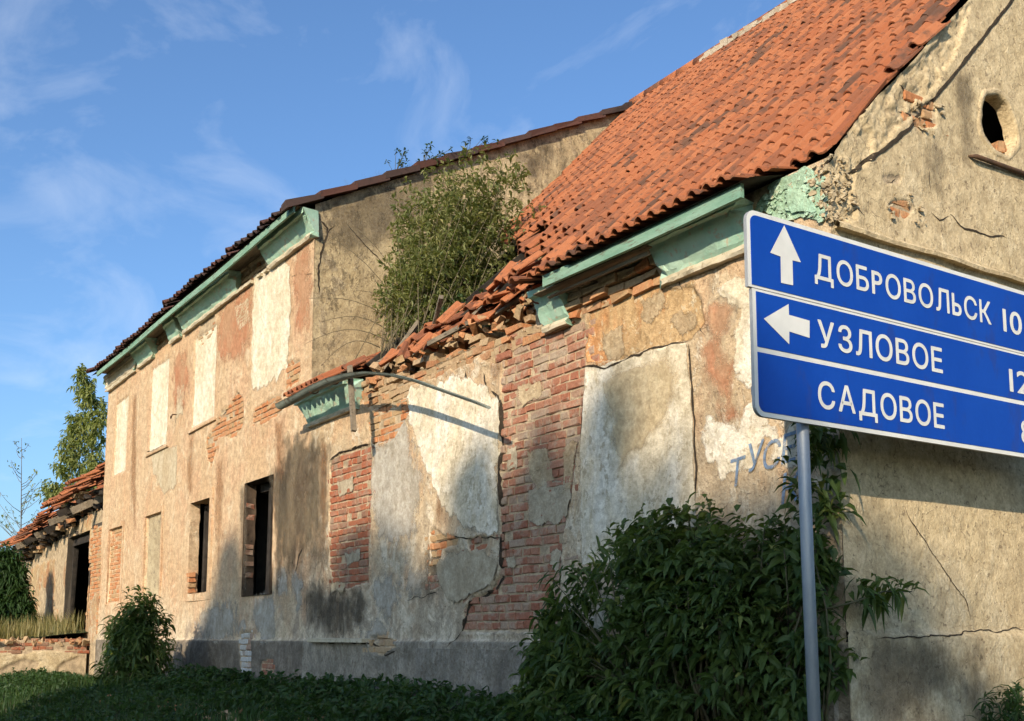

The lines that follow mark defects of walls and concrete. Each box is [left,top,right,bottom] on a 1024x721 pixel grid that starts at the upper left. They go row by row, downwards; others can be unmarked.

spalling [901,90,949,136]
crack [848,0,1014,174]
crack [292,219,389,292]
peeling [754,154,859,224]
crack [929,173,1005,237]
peeling [173,352,188,418]
peeling [199,246,313,466]
peeling [327,274,797,630]
crack [586,282,705,499]
crack [877,511,1021,639]